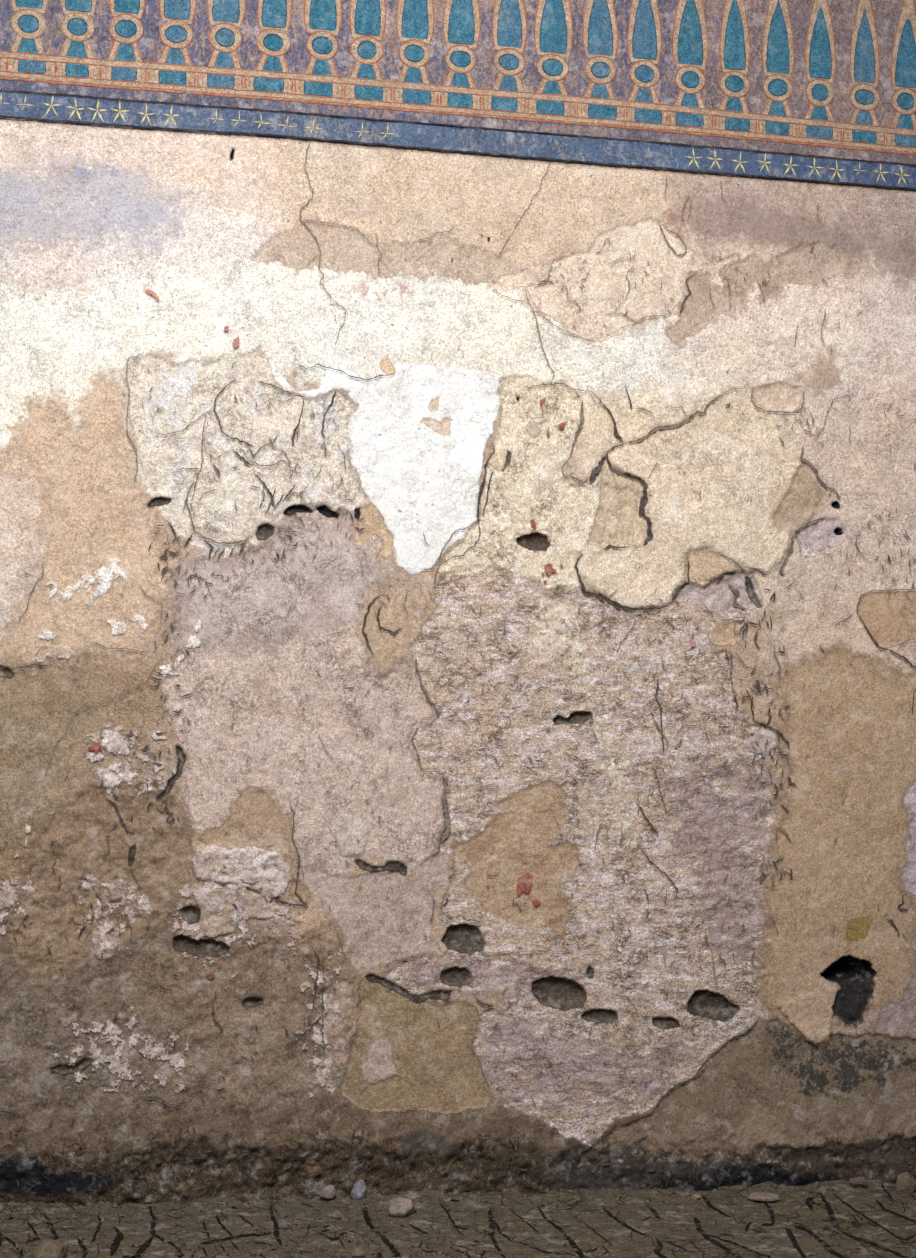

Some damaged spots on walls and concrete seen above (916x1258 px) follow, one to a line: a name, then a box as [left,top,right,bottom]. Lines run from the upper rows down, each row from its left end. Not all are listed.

peeling [107,615,148,635]
spalling [0,665,14,678]
spalling [120,344,848,1147]
crack [254,193,916,1258]
peeling [85,748,154,795]